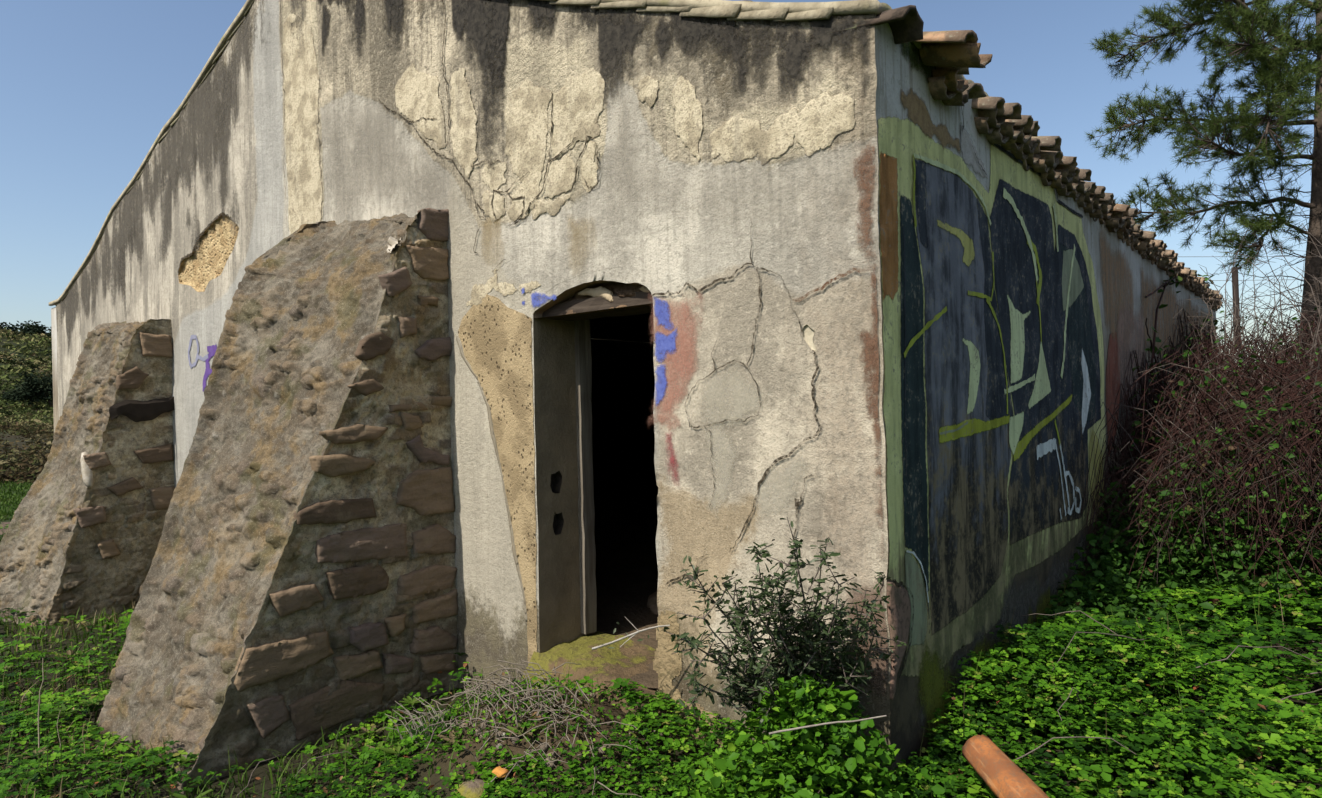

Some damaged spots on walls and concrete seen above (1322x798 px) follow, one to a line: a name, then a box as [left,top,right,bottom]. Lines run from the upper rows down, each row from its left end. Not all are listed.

damp [60,14,262,351]
damp [291,0,365,55]
damp [384,0,404,48]
damp [451,0,511,166]
flaking render [394,62,605,222]
damp [528,0,555,30]
damp [575,5,869,101]
flaking render [638,75,855,165]
spalling [177,212,239,292]
crack [652,222,860,586]
peeling [455,267,653,665]